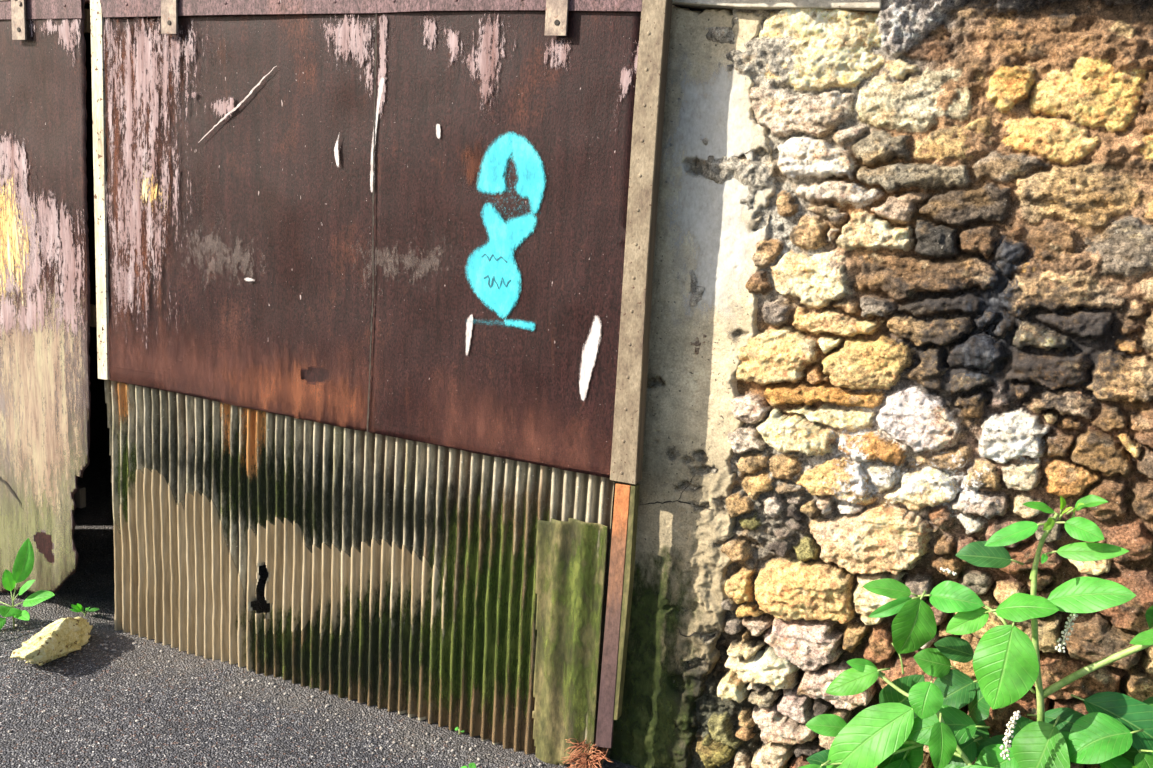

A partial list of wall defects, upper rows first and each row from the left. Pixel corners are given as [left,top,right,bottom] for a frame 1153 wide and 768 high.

peeling [322,14,388,118]
peeling [420,14,516,111]
peeling [542,38,571,68]
peeling [0,133,85,340]
corrosion [103,20,173,319]
peeling [103,16,235,348]
corrosion [466,145,481,183]
damp [0,283,84,518]
corrosion [116,381,129,421]
corrosion [221,363,370,478]
spalling [666,448,727,513]
damp [652,649,710,768]